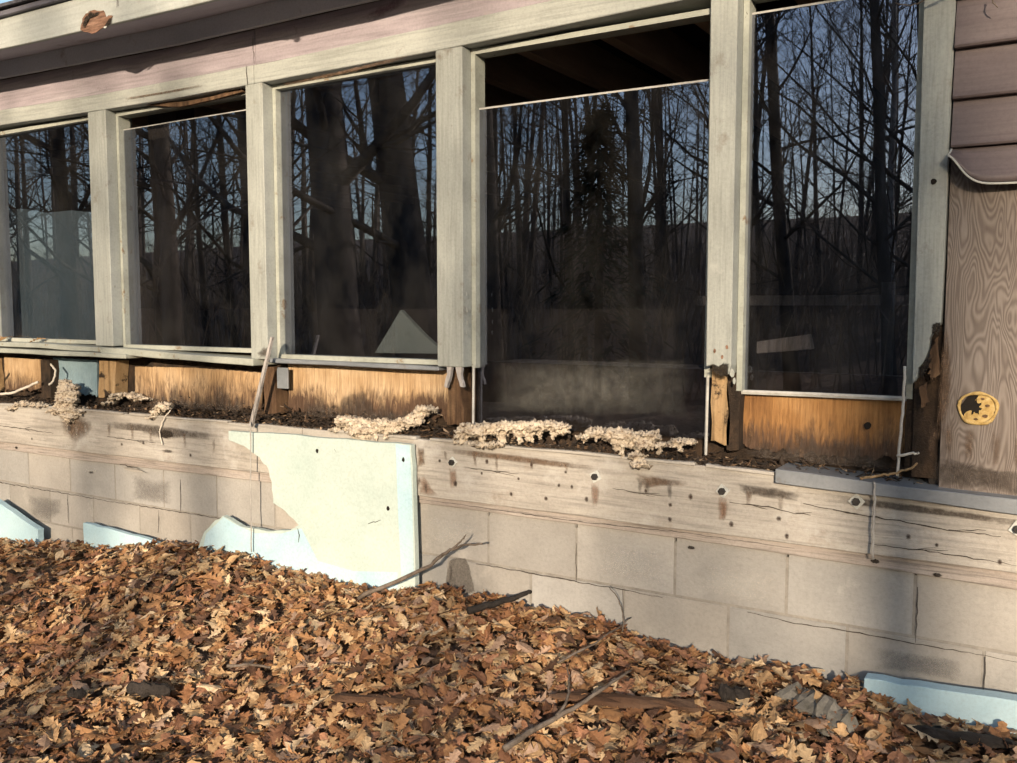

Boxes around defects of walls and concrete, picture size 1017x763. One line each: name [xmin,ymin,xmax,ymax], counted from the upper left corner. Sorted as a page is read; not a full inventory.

peeling [80,10,113,34]
crack [730,502,1016,566]